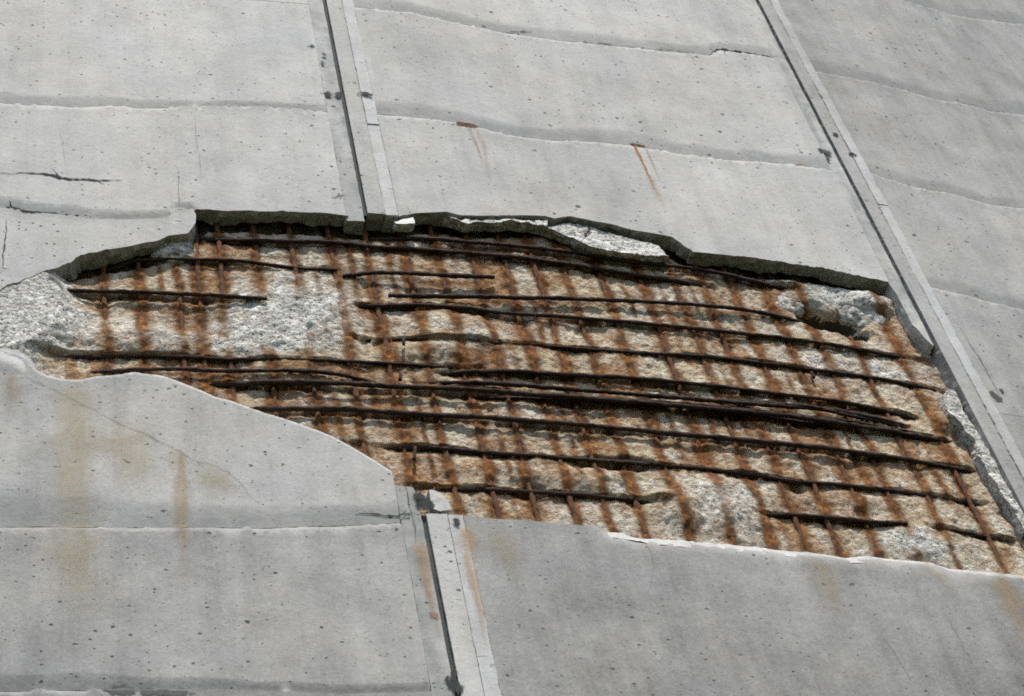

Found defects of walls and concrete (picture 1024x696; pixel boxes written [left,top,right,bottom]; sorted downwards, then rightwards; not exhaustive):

crack [2,201,79,265]
crack [1,168,110,184]
corrosion [97,256,152,376]
corrosion [158,220,263,402]
corrosion [247,349,280,417]
corrosion [281,222,304,287]
corrosion [306,225,465,516]
spalling [0,215,1024,581]
corrosion [630,143,654,186]
corrosion [422,224,1010,574]